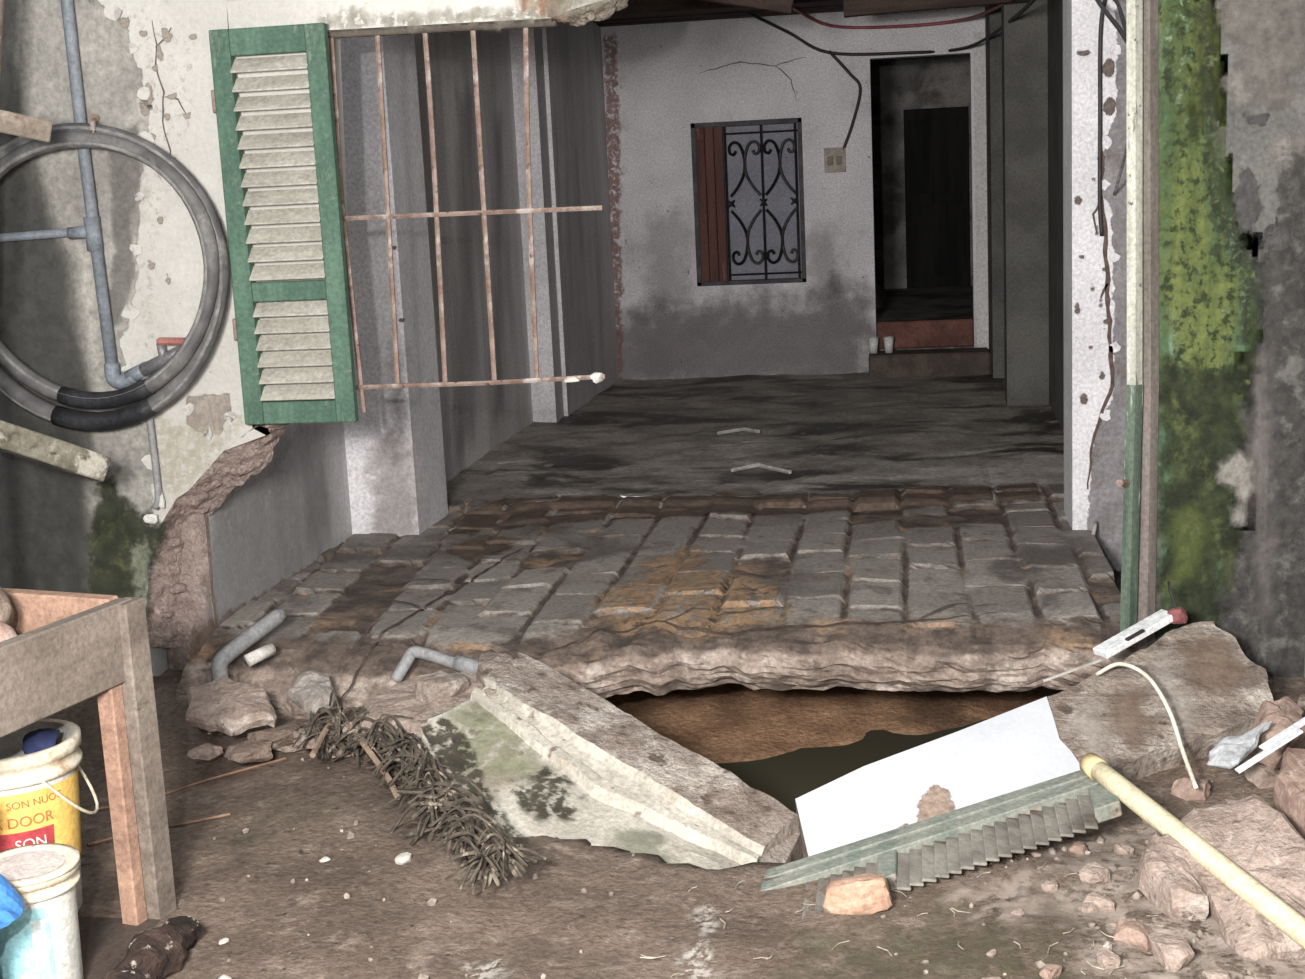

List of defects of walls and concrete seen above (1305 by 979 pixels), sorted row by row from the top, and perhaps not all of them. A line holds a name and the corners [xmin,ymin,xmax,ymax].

flaking render [0,133,17,146]
flaking render [0,148,171,412]
flaking render [0,0,190,144]
spalling [557,0,628,26]
peeling [604,36,629,379]
peeling [1087,0,1127,571]
flaking render [1243,113,1270,126]
water stain [1212,0,1305,109]
flaking render [1231,168,1293,253]
water stain [1209,133,1305,678]
flaking render [0,392,290,670]
flaking render [1217,451,1255,526]